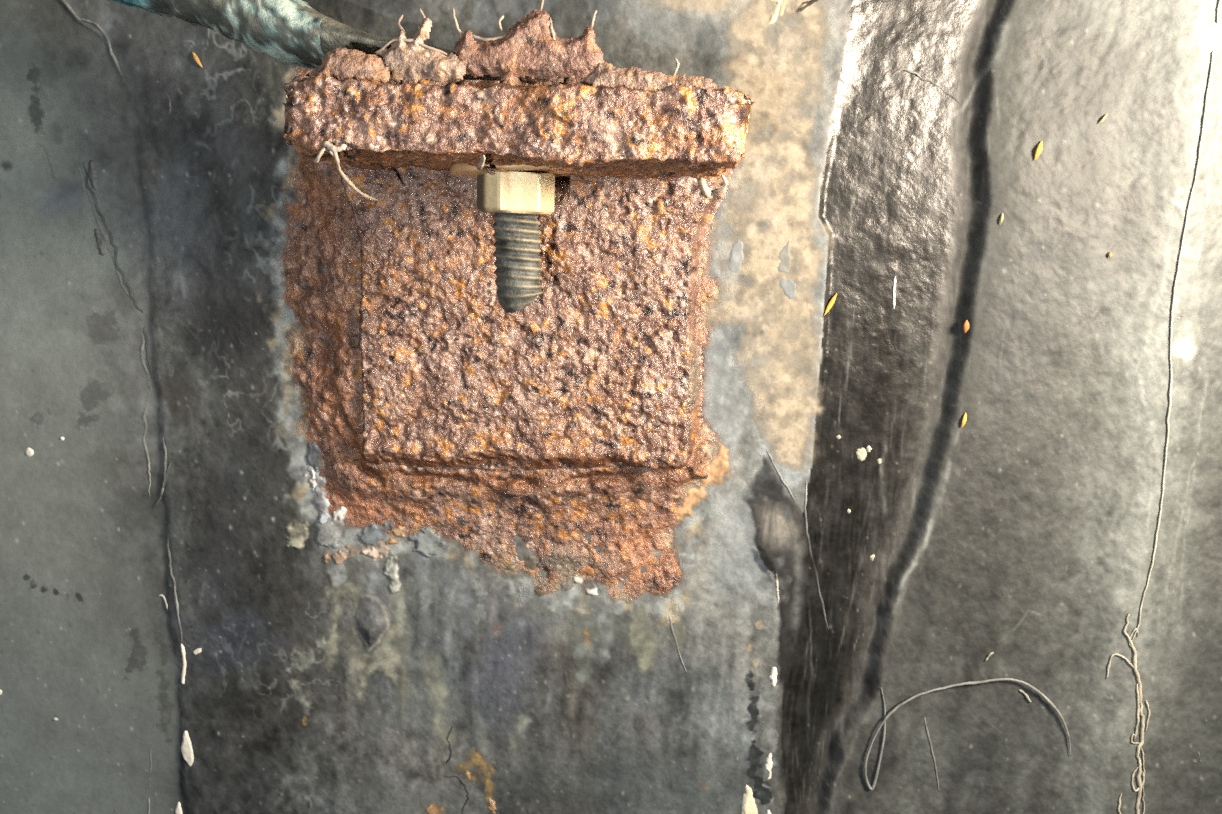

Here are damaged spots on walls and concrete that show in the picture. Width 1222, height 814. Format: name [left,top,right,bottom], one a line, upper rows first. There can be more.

peeling [768,0,787,24]
rust [270,97,286,130]
peeling [727,240,744,273]
peeling [778,240,804,321]
rust [266,145,416,564]
rust [674,445,730,570]
leakage [328,547,347,588]
leakage [367,557,409,638]
leakage [416,554,500,653]
rust [497,554,689,626]
leakage [573,597,613,684]
leakage [630,610,657,672]